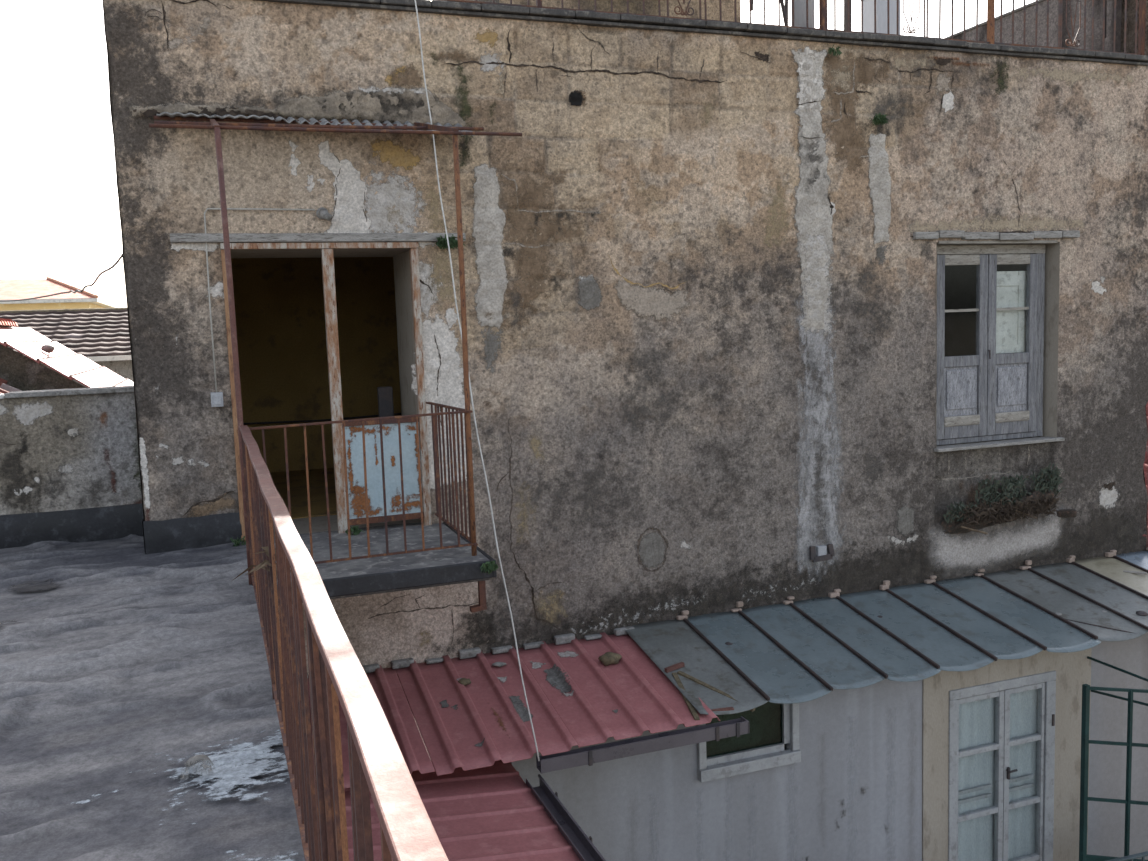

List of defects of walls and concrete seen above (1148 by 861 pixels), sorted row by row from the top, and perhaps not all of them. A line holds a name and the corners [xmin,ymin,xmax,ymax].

crack [446,29,724,98]
flaking render [288,138,475,489]
water stain [857,257,892,348]
water stain [620,343,689,431]
rust [347,423,423,518]
crack [496,419,563,630]
spalling [1099,482,1120,509]
water stain [420,506,1148,658]